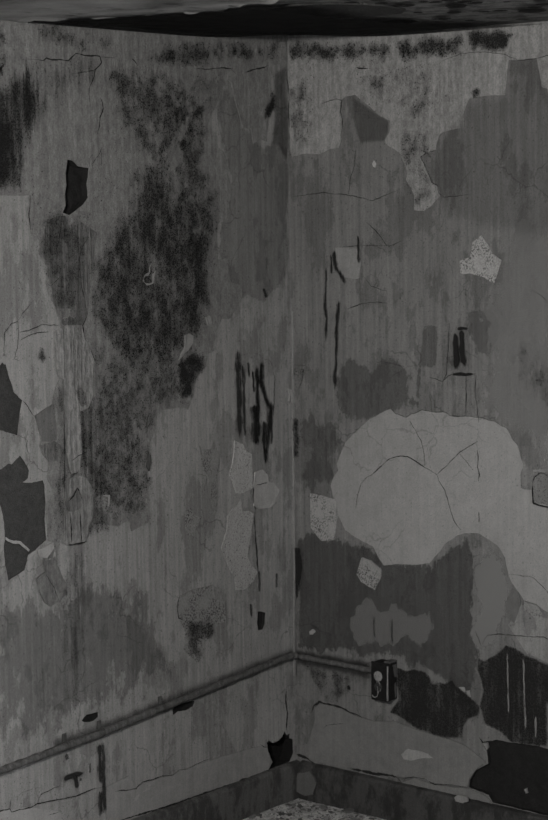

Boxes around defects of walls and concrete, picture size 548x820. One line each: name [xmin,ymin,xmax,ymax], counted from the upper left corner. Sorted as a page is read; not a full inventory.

damp [0,0,548,535]
peeling [0,0,548,607]
crack [356,380,497,529]
flaking render [310,409,548,663]
crack [0,758,211,819]
crack [122,774,257,820]
peeling [105,690,293,820]
peeling [309,704,548,816]